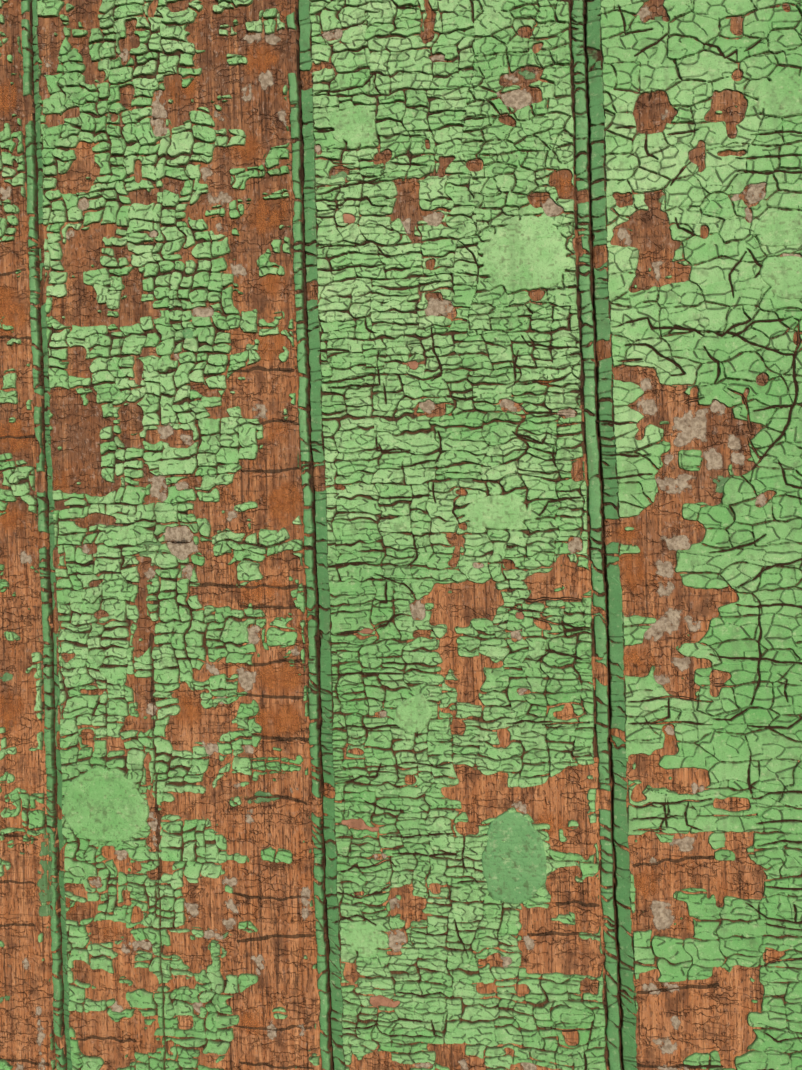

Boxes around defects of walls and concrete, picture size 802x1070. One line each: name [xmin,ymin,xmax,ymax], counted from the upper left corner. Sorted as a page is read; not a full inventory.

peeling [521,167,589,217]
peeling [567,187,712,295]
crack [513,338,636,467]
crack [619,249,802,489]
peeling [0,0,400,1070]
crack [327,535,418,635]
crack [375,431,459,524]
crack [630,558,802,729]
crack [313,725,478,936]
peeling [379,877,447,955]
peeling [346,1042,574,1070]
peeling [630,948,794,1070]